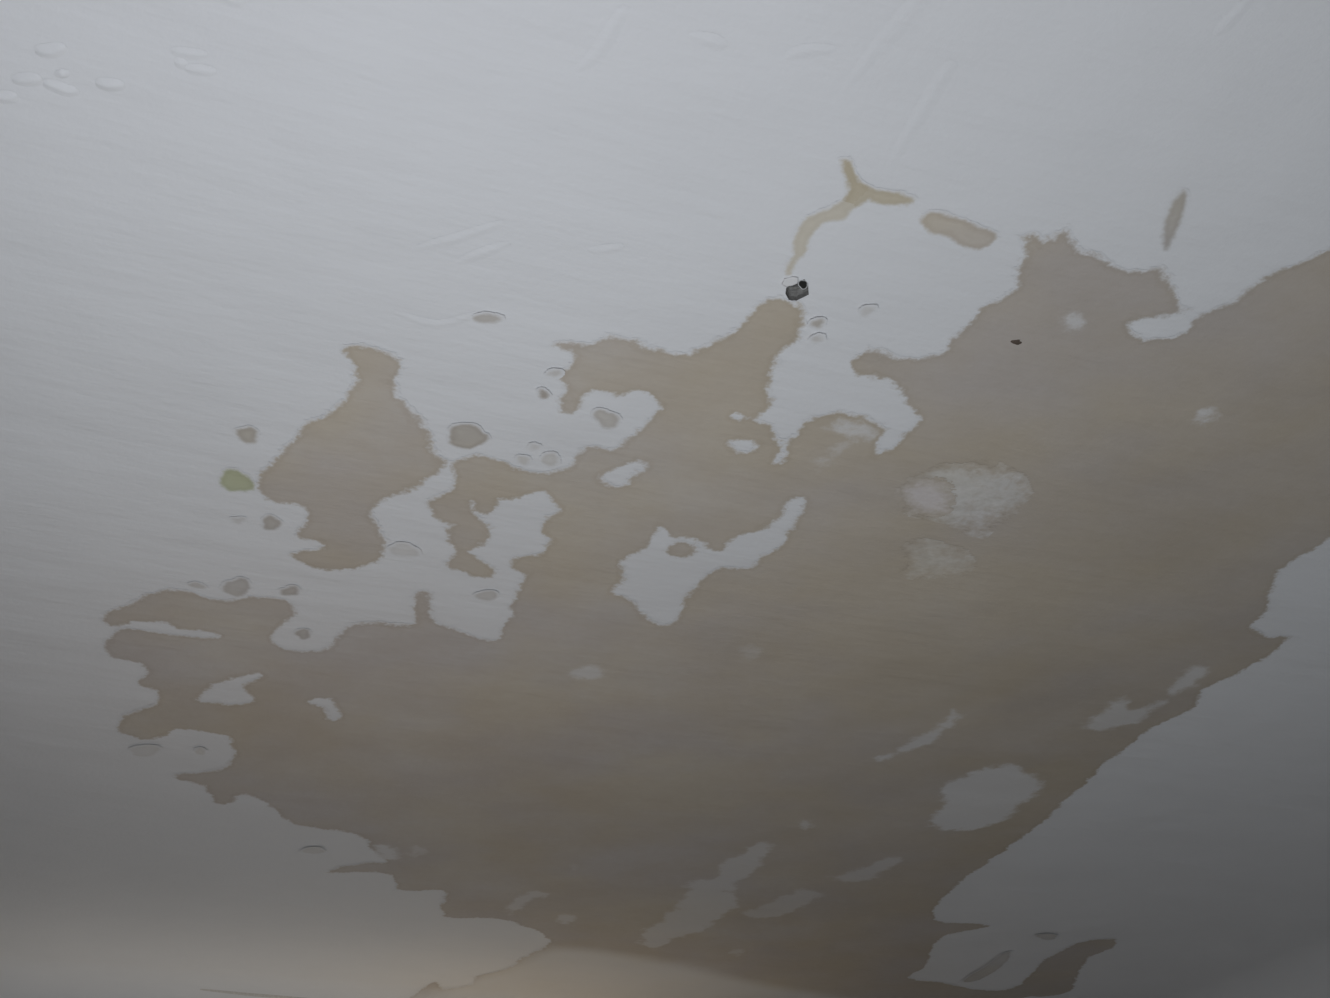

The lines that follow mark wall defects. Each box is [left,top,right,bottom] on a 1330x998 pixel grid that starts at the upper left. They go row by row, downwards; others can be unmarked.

water stain [100,188,1330,998]